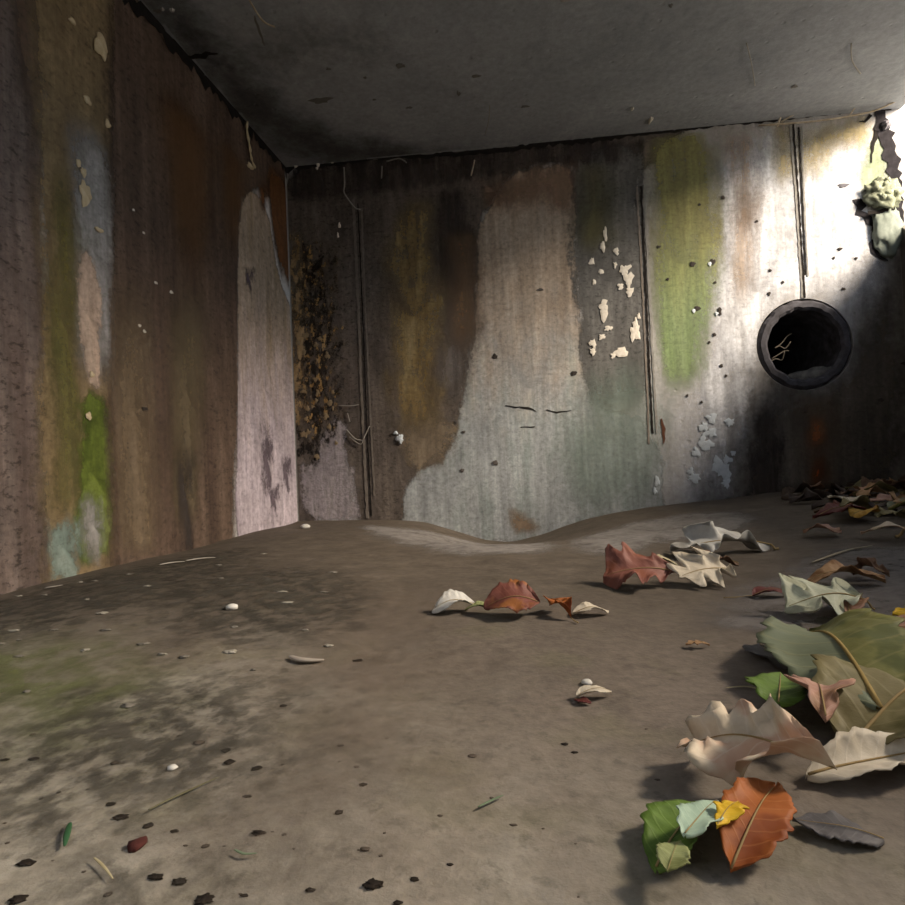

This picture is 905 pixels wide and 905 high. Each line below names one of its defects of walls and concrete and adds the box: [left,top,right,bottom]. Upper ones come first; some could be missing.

water stain [106,0,684,566]
crack [123,0,904,222]
peeling [402,164,665,542]
water stain [573,512,752,553]
peeling [692,413,736,489]
water stain [699,136,905,500]